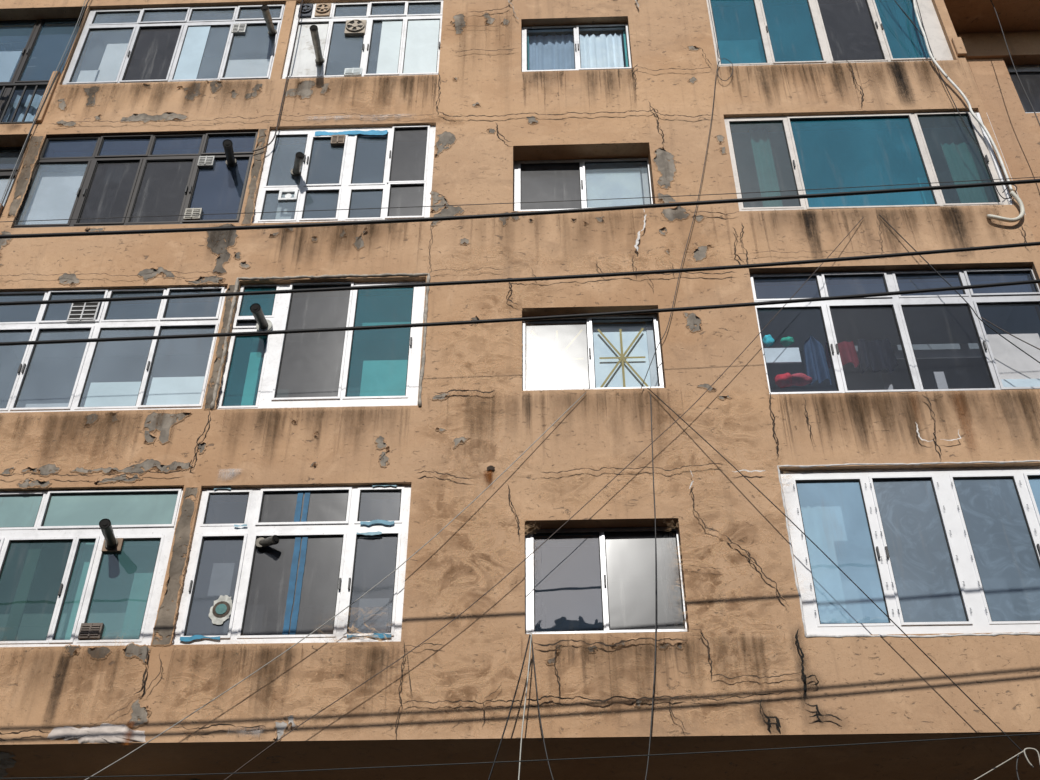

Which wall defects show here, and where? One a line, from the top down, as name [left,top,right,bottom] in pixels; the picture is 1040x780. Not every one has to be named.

leakage [877,61,909,98]
peeling [434,131,457,157]
peeling [7,135,45,217]
peeling [430,191,465,226]
peeling [653,147,705,236]
leakage [946,208,964,237]
peeling [0,230,13,266]
peeling [137,128,268,445]
peeling [84,411,120,428]
peeling [1,442,207,489]
crack [395,629,842,735]
peeling [128,696,152,728]